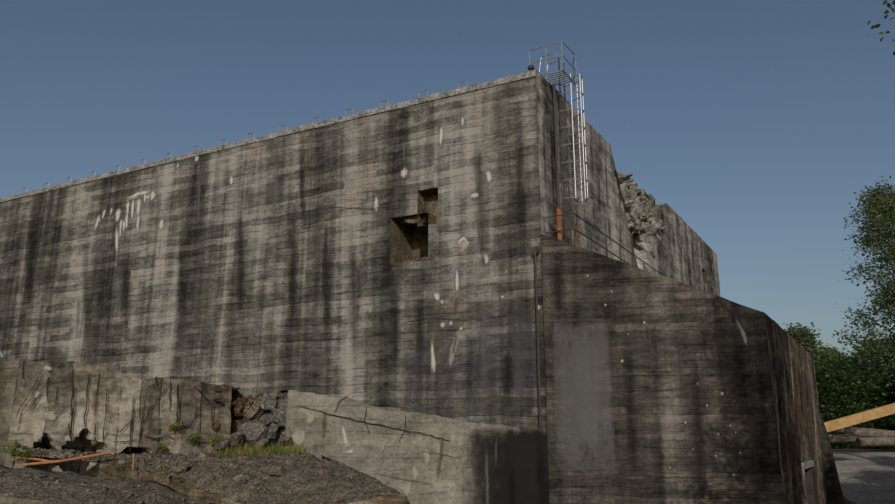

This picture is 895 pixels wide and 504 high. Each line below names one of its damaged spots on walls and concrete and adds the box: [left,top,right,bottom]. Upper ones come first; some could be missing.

damp [95,191,155,250]
damp [441,321,462,365]